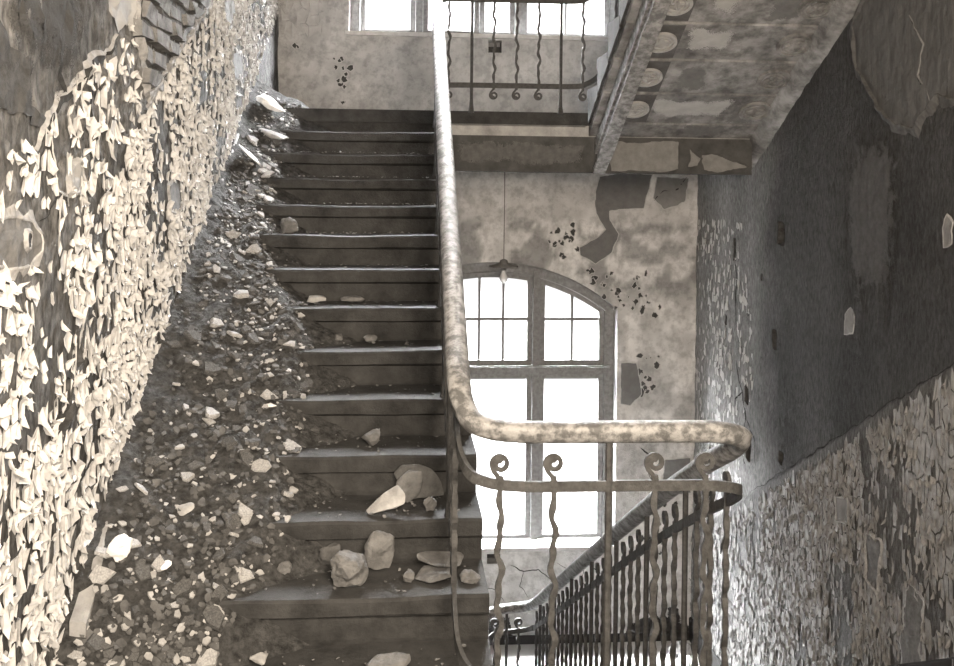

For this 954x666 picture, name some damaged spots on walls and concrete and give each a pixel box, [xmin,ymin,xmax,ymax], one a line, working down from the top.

crack [909,15,930,101]
flaking render [548,139,749,319]
flaking render [942,213,954,248]
peeling [0,0,330,666]
peeling [695,218,753,424]
flaking render [844,307,855,335]
flaking render [663,443,716,479]
peeling [689,368,954,666]